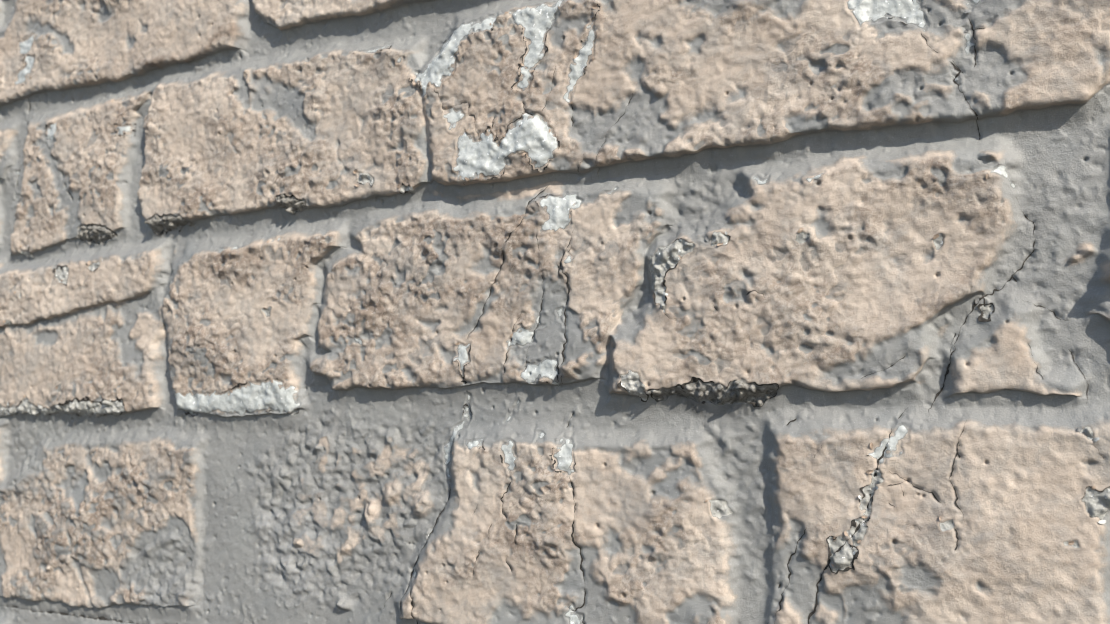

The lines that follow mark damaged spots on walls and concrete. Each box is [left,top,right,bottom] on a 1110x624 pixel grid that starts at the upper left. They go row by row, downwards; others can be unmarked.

peeling [409,0,562,96]
peeling [563,4,600,104]
peeling [848,0,925,31]
peeling [442,106,560,183]
peeling [534,194,581,231]
crack [466,185,573,382]
peeling [173,378,300,417]
spalling [617,370,779,407]
crack [774,202,1068,624]
crack [384,492,450,624]
crack [568,480,586,624]
peeling [1082,486,1110,524]